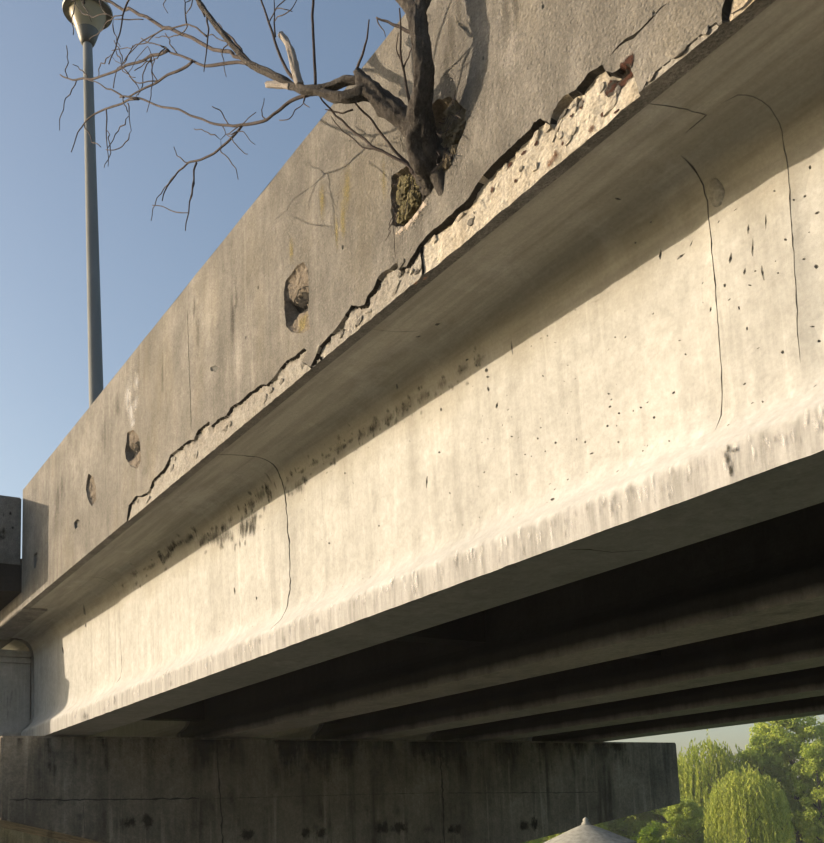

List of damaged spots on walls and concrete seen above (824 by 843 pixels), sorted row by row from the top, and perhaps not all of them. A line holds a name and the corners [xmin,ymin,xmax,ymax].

rust [605,53,633,96]
crack [610,3,667,56]
spalling [125,0,755,521]
crack [683,157,723,430]
crack [730,94,800,355]
water stain [152,476,272,567]
crack [221,454,291,630]
crack [10,795,199,803]